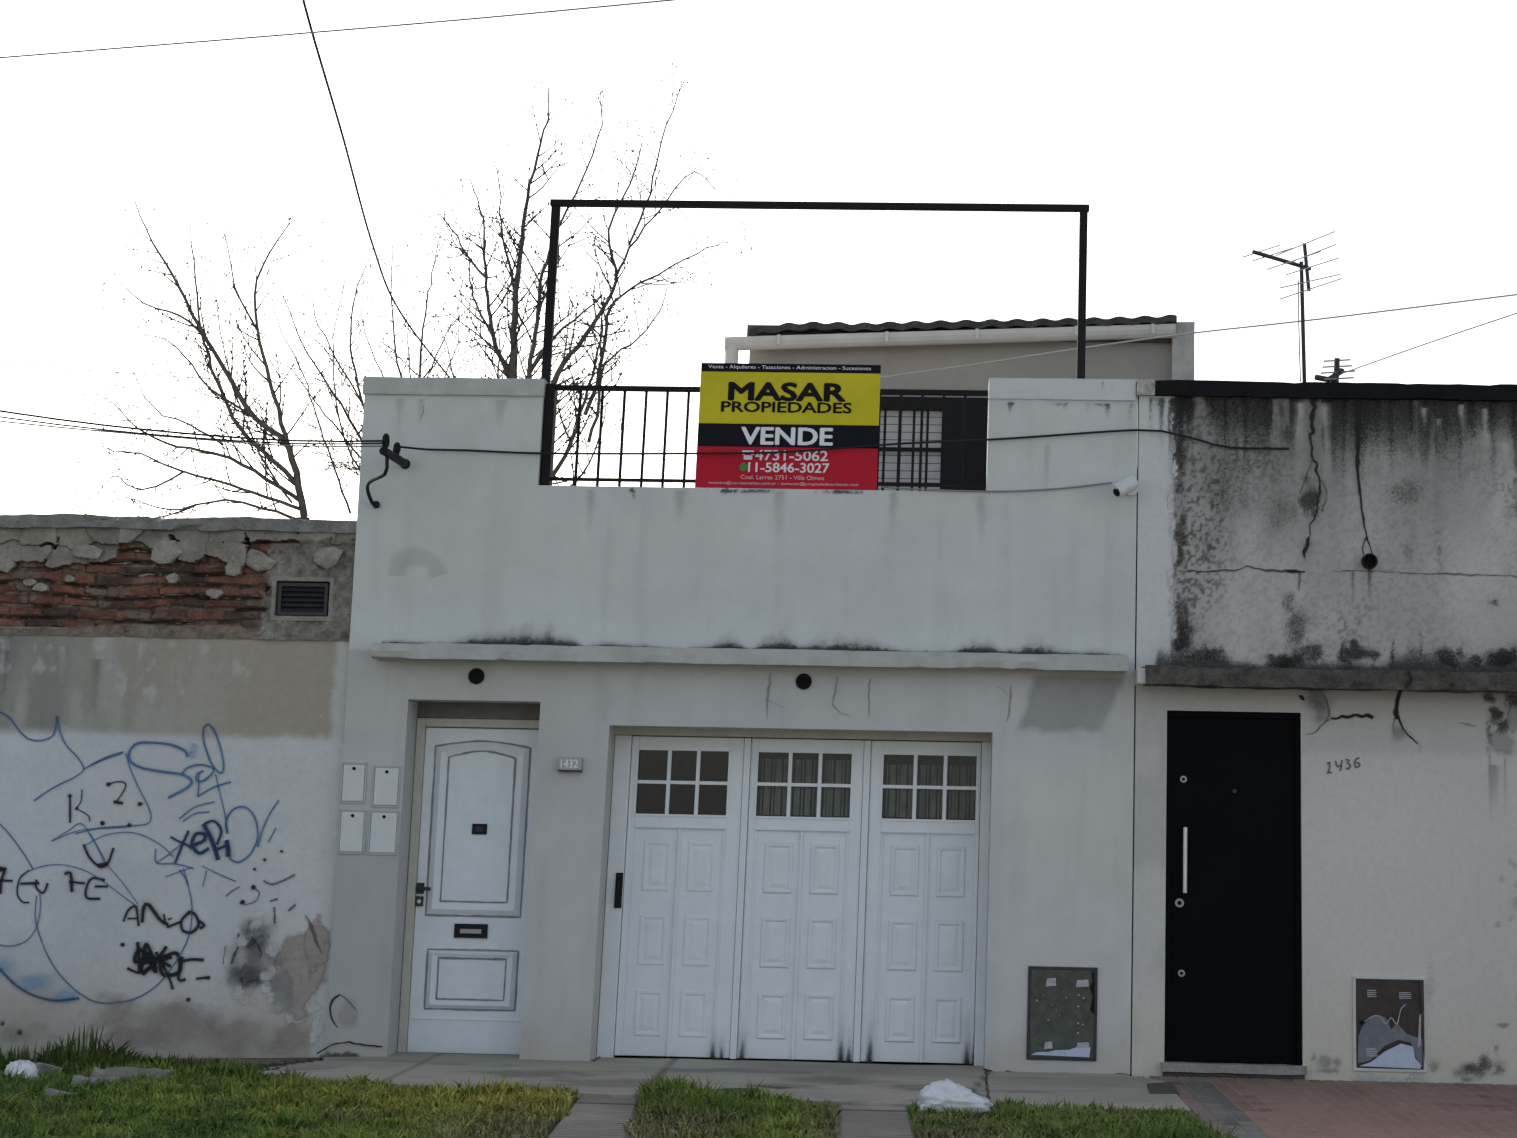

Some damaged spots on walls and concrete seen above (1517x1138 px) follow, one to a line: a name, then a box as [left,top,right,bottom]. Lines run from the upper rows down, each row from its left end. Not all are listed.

leakage [1150,396,1517,578]
crack [1178,399,1516,588]
crack [1305,671,1421,749]
peeling [260,915,383,1061]